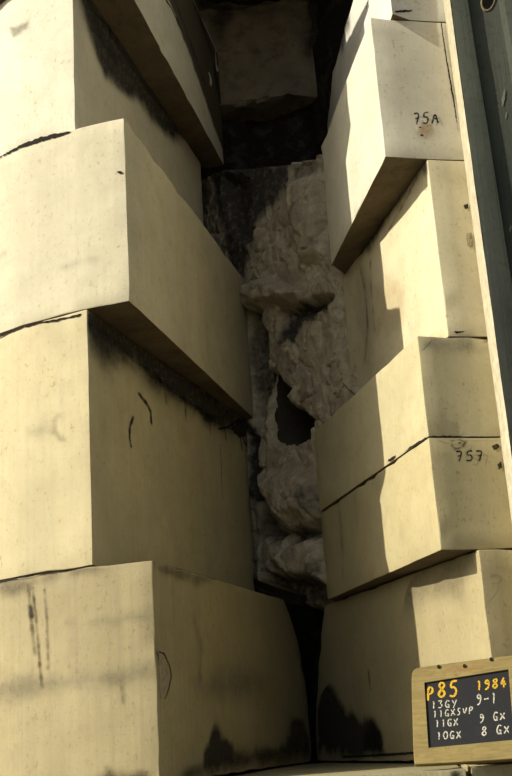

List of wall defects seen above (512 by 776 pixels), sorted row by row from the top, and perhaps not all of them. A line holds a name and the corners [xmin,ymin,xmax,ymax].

water stain [170,0,230,147]
crack [0,131,70,158]
crack [0,314,81,337]
spalling [201,154,359,611]
crack [0,568,75,583]